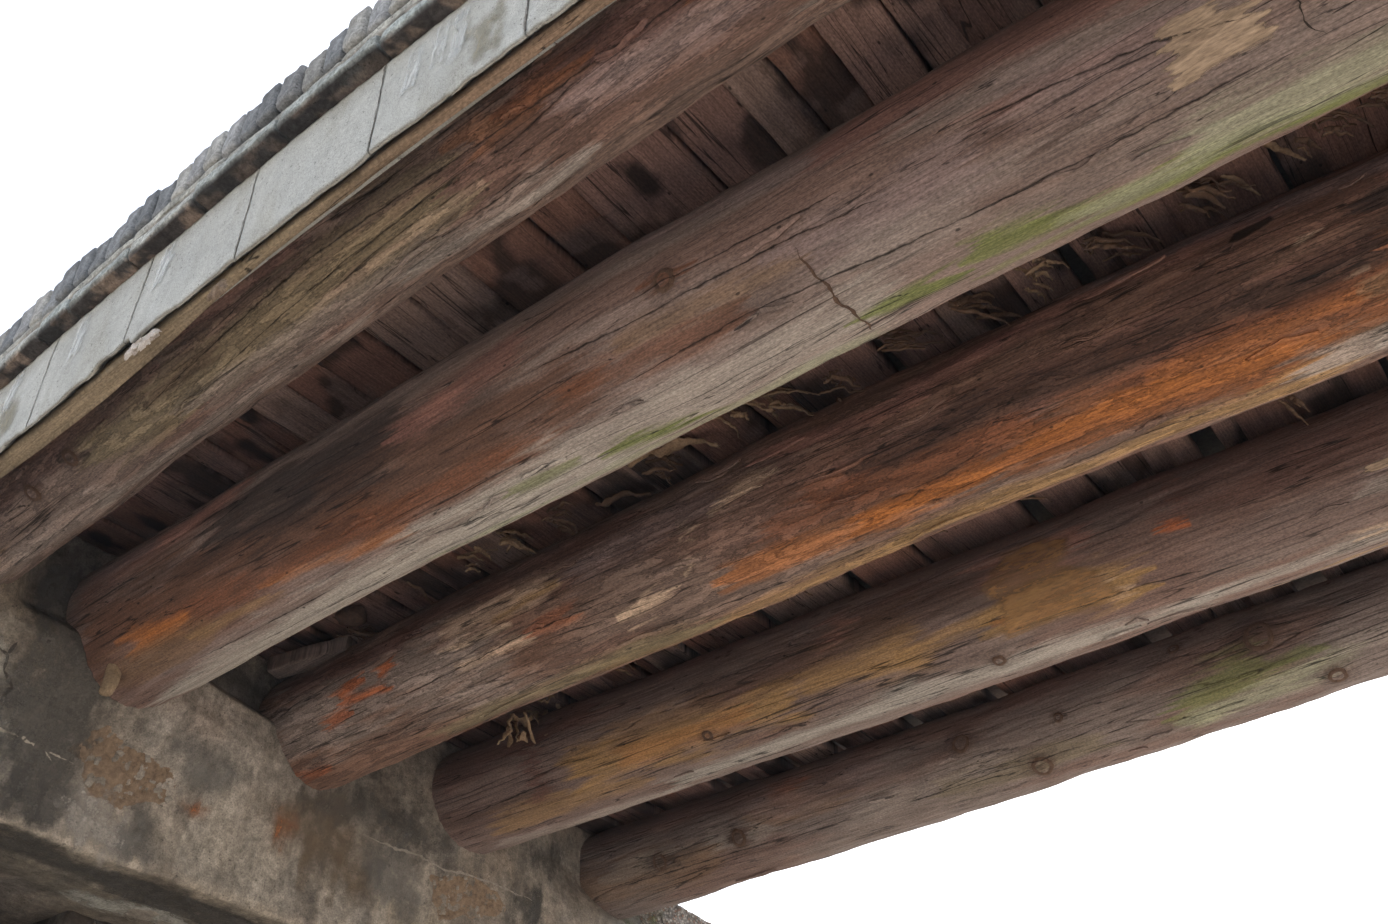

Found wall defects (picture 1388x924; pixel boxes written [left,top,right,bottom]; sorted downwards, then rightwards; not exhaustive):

crack [795,247,873,330]
water stain [0,568,256,924]